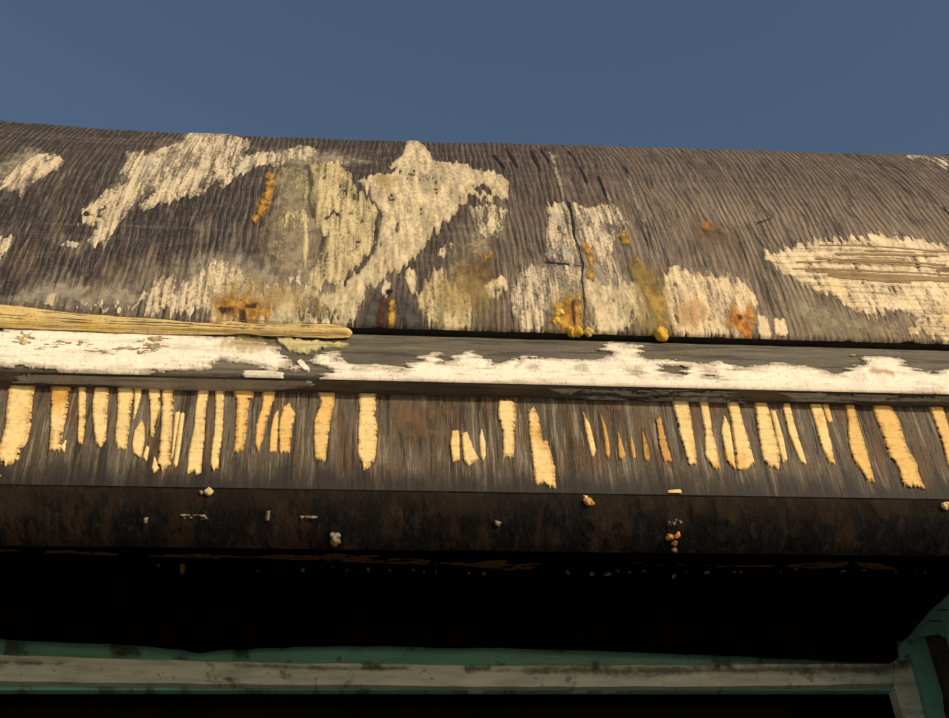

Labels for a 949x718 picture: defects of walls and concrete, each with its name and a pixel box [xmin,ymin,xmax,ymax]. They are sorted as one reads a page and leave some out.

rust [253,172,279,223]
crack [546,202,594,330]
rust [582,242,594,280]
rust [214,294,271,324]
peeling [0,133,949,489]
rust [553,291,583,333]
rust [726,304,756,339]